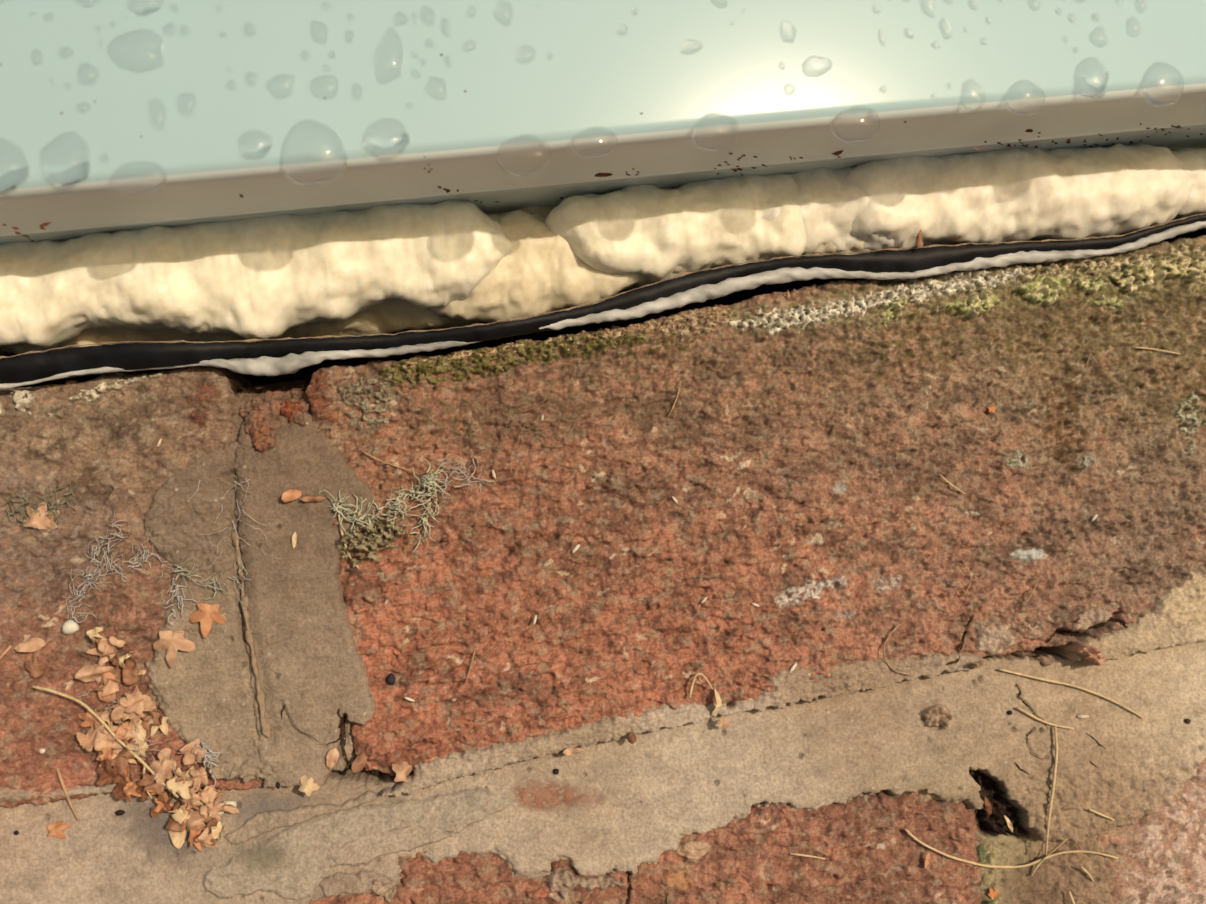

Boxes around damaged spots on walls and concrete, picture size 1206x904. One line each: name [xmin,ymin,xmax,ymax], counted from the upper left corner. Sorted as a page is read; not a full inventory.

spalling [188,385,218,427]
spalling [239,370,335,452]
crack [946,614,974,665]
spalling [1019,618,1107,667]
spalling [920,705,952,730]
spalling [969,769,1030,837]
peeling [202,786,513,904]
spalling [527,870,624,900]
spalling [664,840,712,891]